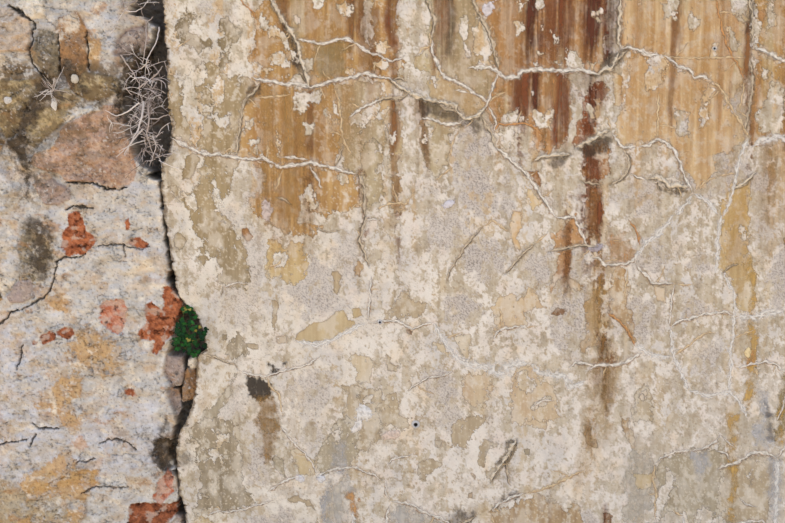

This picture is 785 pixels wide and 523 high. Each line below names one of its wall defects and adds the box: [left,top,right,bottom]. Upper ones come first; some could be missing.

crack [8,5,62,79]
corrosion [520,0,538,49]
corrosion [583,0,614,60]
corrosion [515,72,539,123]
peeling [163,0,785,294]
crack [0,243,150,325]
spalling [61,212,97,257]
spalling [138,280,185,356]
crack [172,0,785,523]
corrosion [581,118,606,309]
peeling [128,373,256,523]
water stain [246,363,285,459]